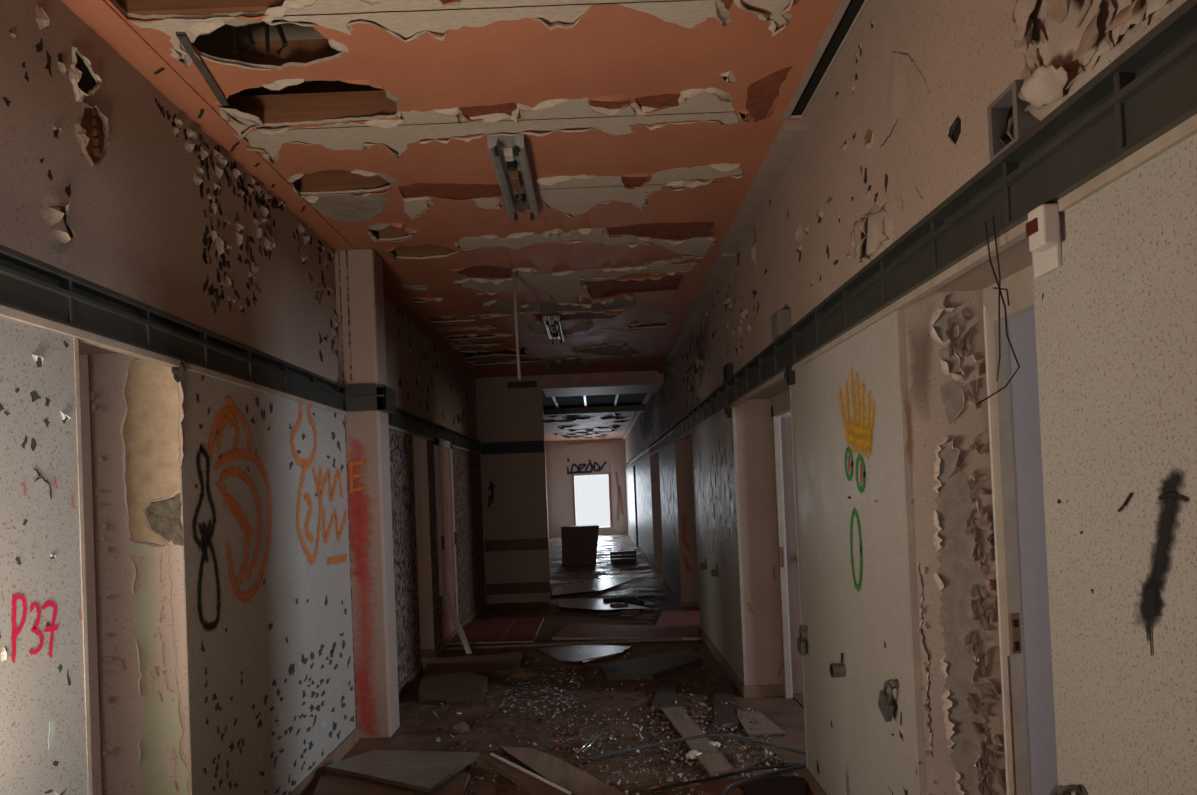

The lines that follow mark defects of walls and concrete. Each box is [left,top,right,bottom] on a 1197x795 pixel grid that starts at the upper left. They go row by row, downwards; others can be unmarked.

peeling [1012,0,1183,121]
spalling [35,3,110,167]
peeling [459,102,517,123]
peeling [588,94,681,113]
peeling [745,66,793,124]
spalling [945,114,961,148]
peeling [396,183,503,201]
peeling [606,222,718,240]
peeling [531,274,685,321]
peeling [15,387,71,428]
peeling [929,301,997,795]
peeling [251,633,354,795]